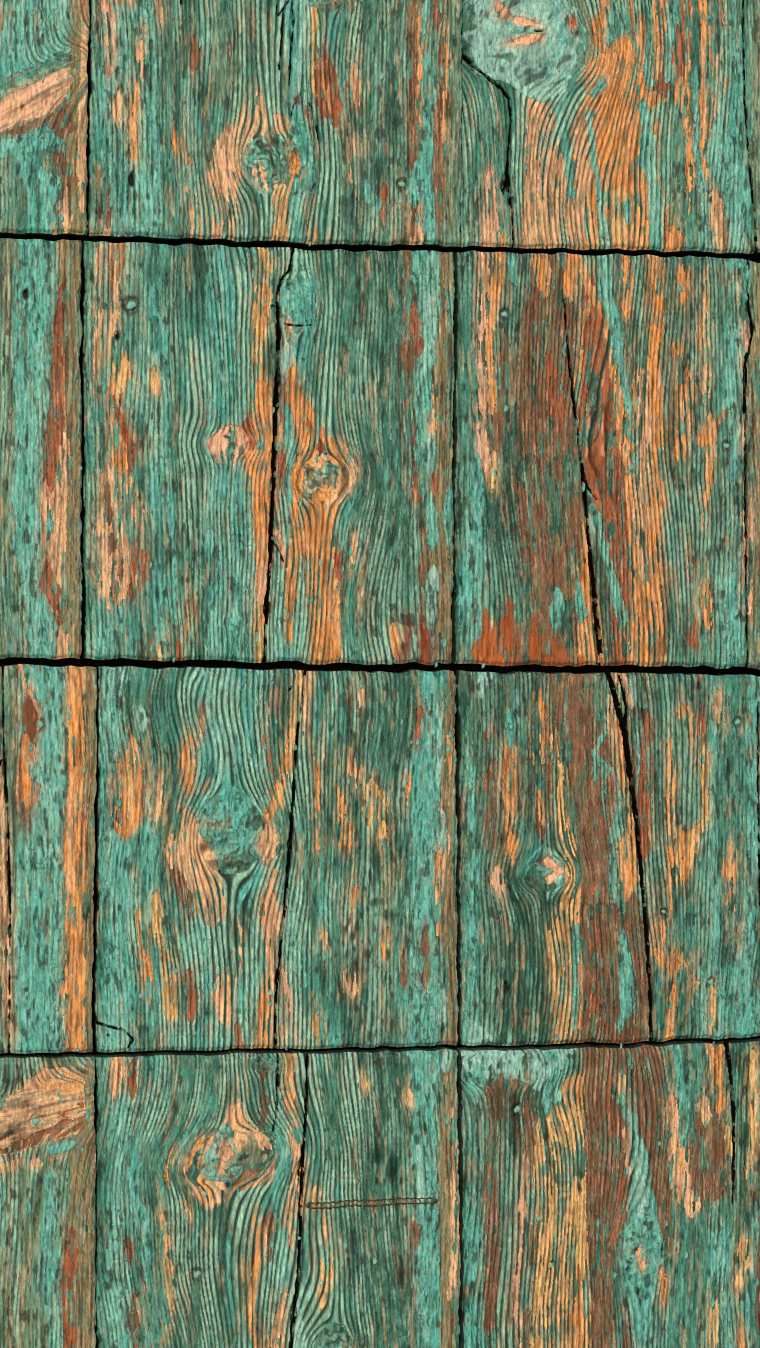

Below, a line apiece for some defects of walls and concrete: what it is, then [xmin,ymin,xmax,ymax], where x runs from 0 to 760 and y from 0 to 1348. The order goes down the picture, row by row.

peeling [0,0,369,1348]
crack [263,248,311,663]
crack [272,669,308,1348]
peeling [335,746,388,853]
crack [462,56,514,251]
crack [563,300,653,1045]
peeling [472,0,760,1348]